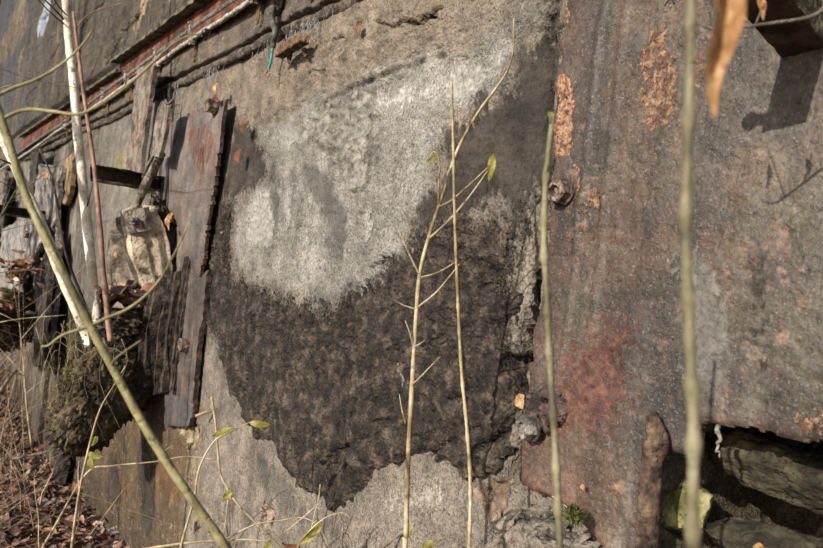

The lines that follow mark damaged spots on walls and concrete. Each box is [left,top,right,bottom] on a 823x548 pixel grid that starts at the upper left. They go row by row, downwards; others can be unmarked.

water stain [221,114,308,259]
water stain [302,164,346,261]
efflorescence [363,210,377,245]
water stain [368,5,567,233]
rust [524,308,642,455]
efflorescence [379,477,447,520]